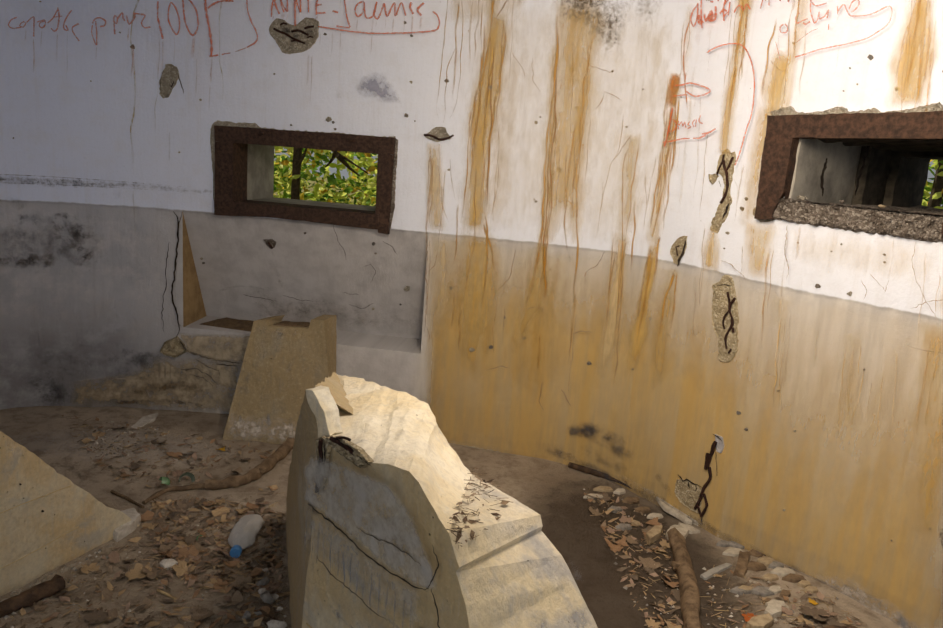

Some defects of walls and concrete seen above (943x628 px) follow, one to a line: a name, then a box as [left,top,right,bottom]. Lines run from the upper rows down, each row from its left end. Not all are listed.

spalling [159,64,184,98]
spalling [269,17,327,54]
corrosion [464,1,506,361]
corrosion [521,9,597,333]
corrosion [652,55,687,215]
corrosion [754,0,800,182]
spalling [709,149,943,243]
corrosion [898,0,930,104]
crack [161,211,239,386]
spalling [670,236,688,267]
spalling [712,275,739,363]
spalling [674,434,724,524]